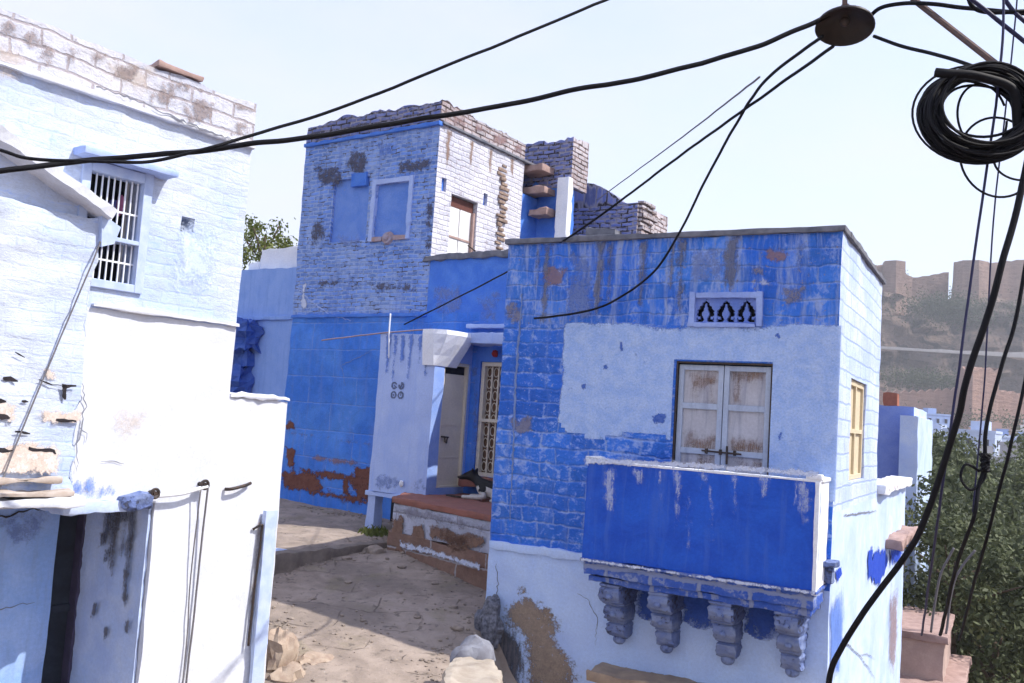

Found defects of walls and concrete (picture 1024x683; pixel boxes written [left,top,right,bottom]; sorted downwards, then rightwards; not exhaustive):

flaking render [495,164,510,250]
damp [385,334,423,379]
flaking render [40,410,81,423]
flaking render [0,441,61,475]
flaking render [282,446,370,504]
peeling [391,509,484,552]
damp [102,511,135,604]